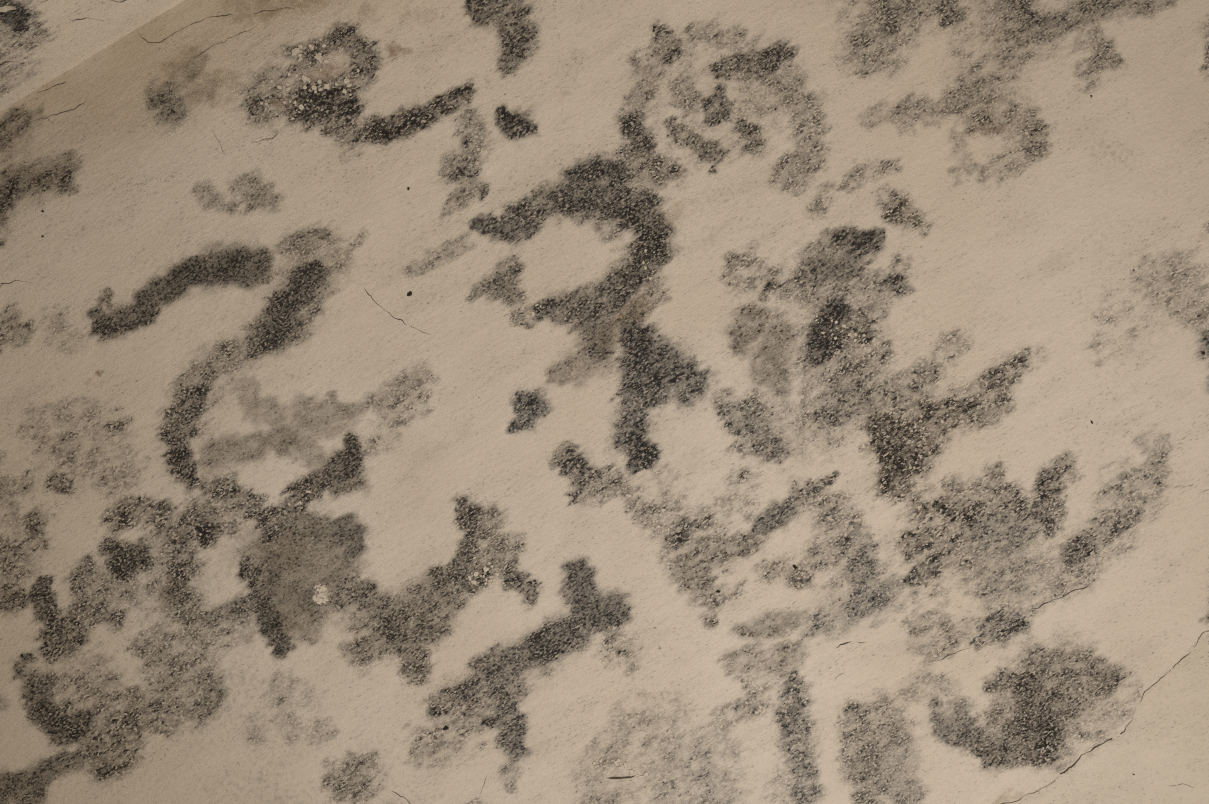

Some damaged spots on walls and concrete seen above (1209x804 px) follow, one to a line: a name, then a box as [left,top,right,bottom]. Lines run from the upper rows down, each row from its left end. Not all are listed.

damp [0,0,54,93]
damp [146,61,194,124]
crack [137,8,282,58]
damp [0,105,81,225]
damp [195,174,278,213]
damp [1137,256,1209,359]
damp [241,0,1173,804]
damp [0,227,639,804]
crack [1003,631,1208,804]